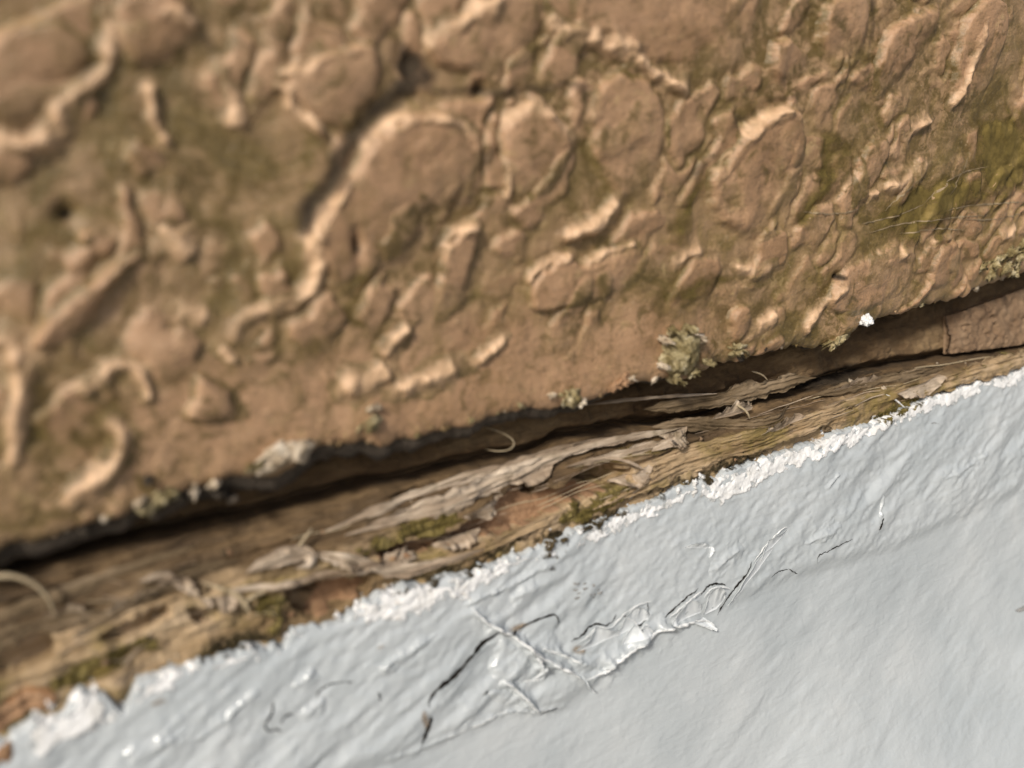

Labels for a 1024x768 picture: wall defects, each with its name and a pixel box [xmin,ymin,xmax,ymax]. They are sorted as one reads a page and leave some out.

crack [422,614,559,744]